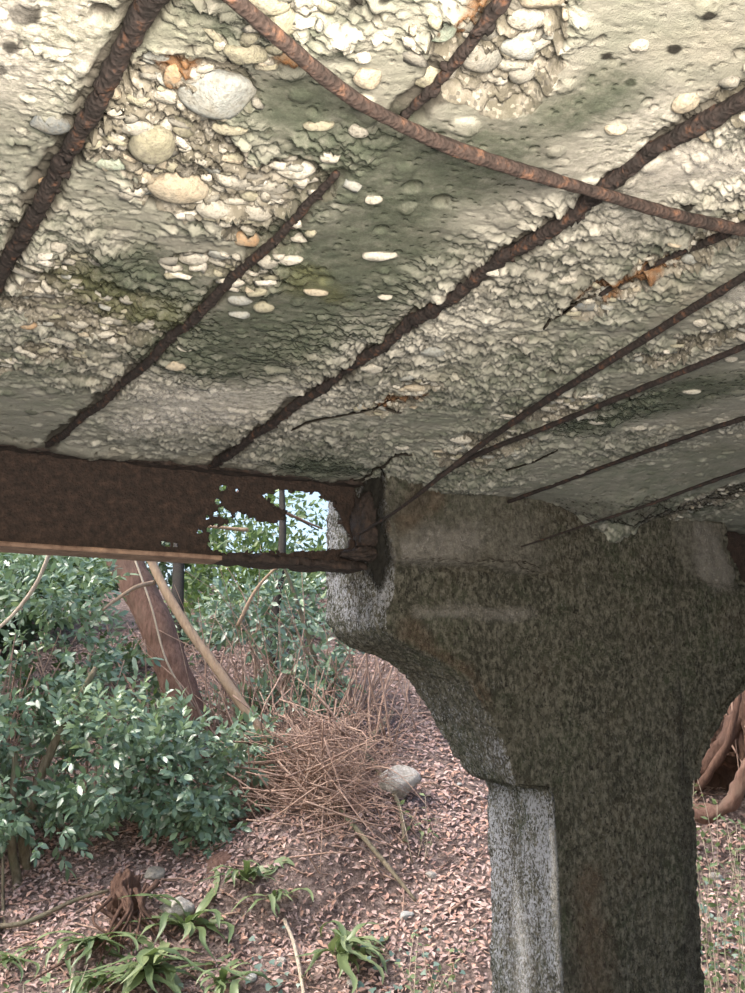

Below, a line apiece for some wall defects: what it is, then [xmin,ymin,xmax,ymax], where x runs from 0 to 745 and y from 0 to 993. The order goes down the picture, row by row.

rust [163,55,195,81]
spalling [0,0,745,469]
rust [576,258,678,299]
crack [543,293,600,330]
spalling [356,271,745,548]
rust [267,490,288,524]
rust [205,510,254,552]